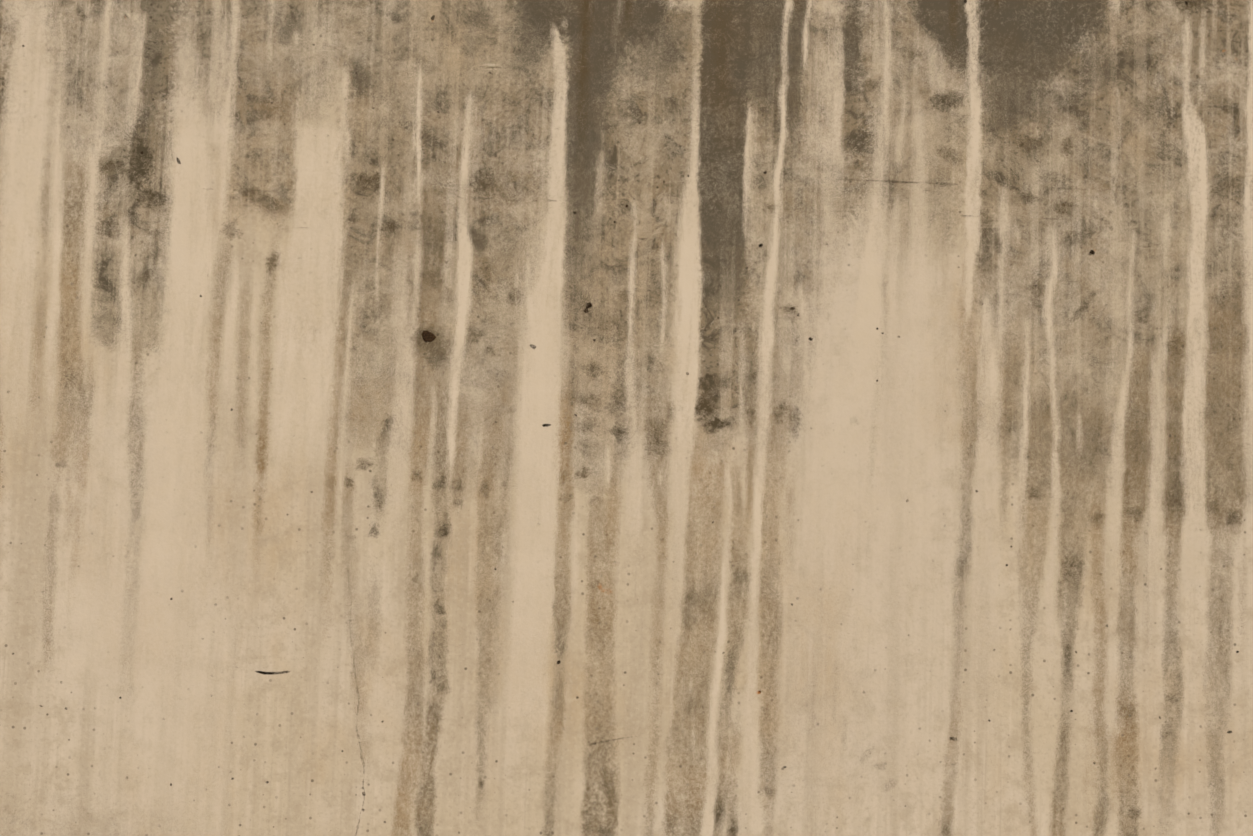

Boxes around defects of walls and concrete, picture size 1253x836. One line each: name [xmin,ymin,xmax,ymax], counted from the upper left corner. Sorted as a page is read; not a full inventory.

water stain [0,0,490,836]
water stain [473,0,1253,836]